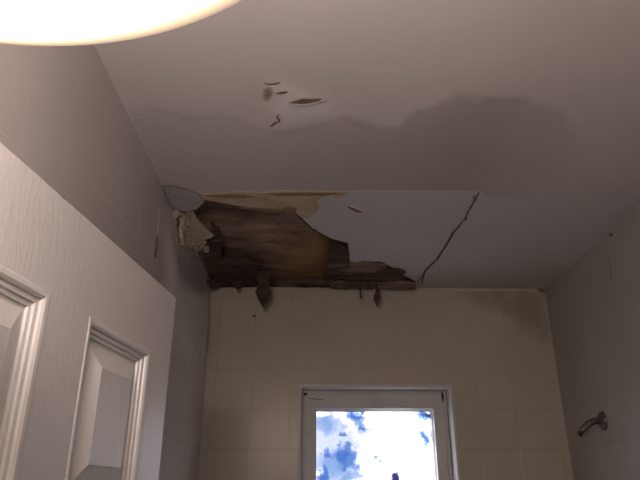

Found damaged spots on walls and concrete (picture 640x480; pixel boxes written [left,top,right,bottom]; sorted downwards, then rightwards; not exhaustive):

leakage [126,90,596,202]
flaking render [163,184,214,255]
crack [418,192,479,285]